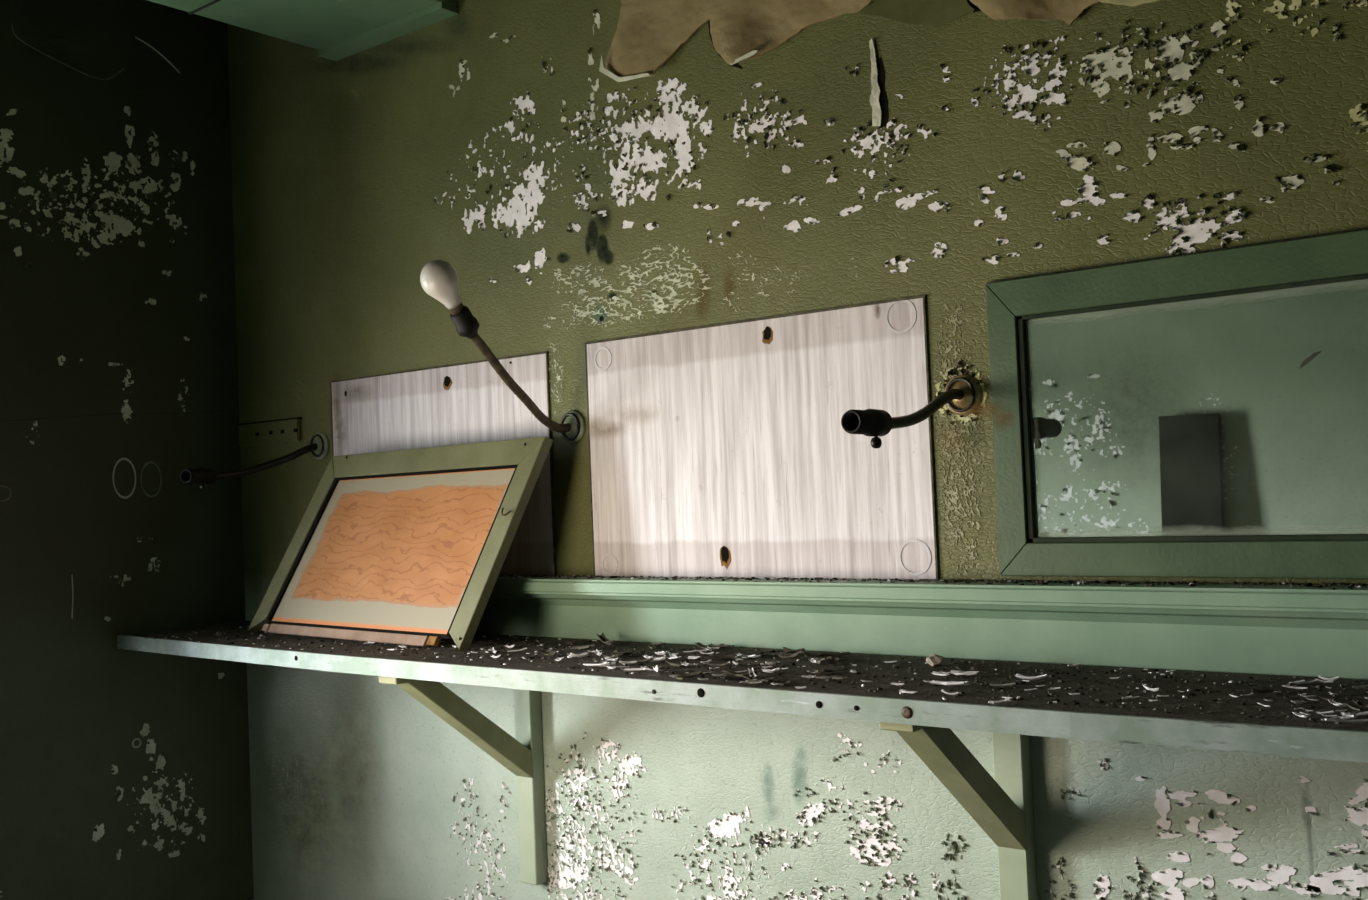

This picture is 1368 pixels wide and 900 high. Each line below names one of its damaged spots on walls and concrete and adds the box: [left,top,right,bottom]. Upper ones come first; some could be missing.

peeling [0,106,195,269]
peeling [433,0,1368,285]
peeling [1229,675,1368,723]
peeling [92,823,106,842]
peeling [111,723,206,860]
peeling [446,777,511,900]
peeling [545,732,966,900]
peeling [1044,857,1074,900]
peeling [1093,776,1368,900]